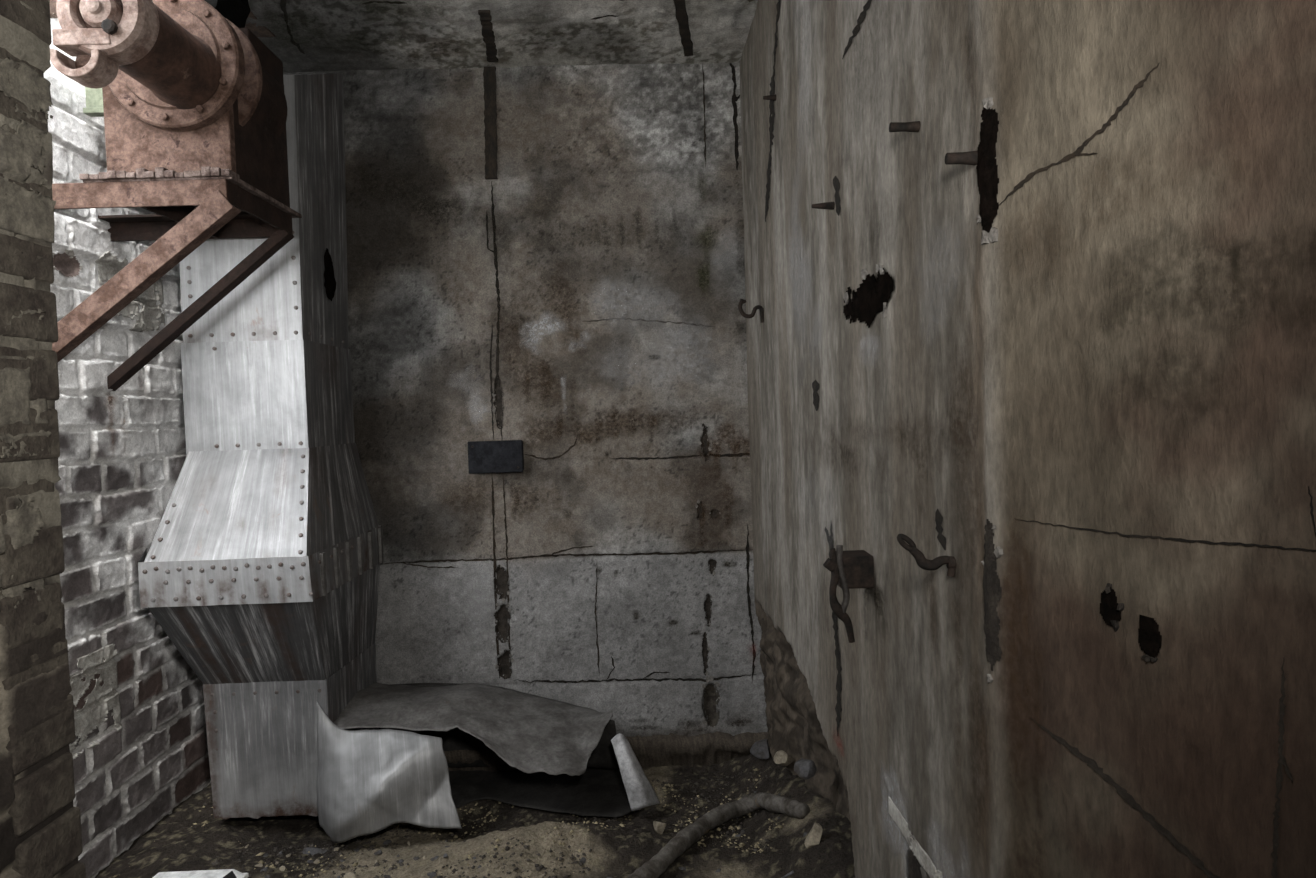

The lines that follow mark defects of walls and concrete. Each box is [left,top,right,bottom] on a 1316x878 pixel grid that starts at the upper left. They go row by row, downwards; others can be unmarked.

crack [999,63,1159,205]
spalling [843,264,894,328]
spalling [492,377,504,430]
spalling [699,423,712,462]
crack [1017,486,1316,551]
spalling [708,559,733,576]
spalling [494,564,514,679]
spalling [688,594,744,727]
hole [1100,583,1124,631]
hole [1138,614,1162,662]